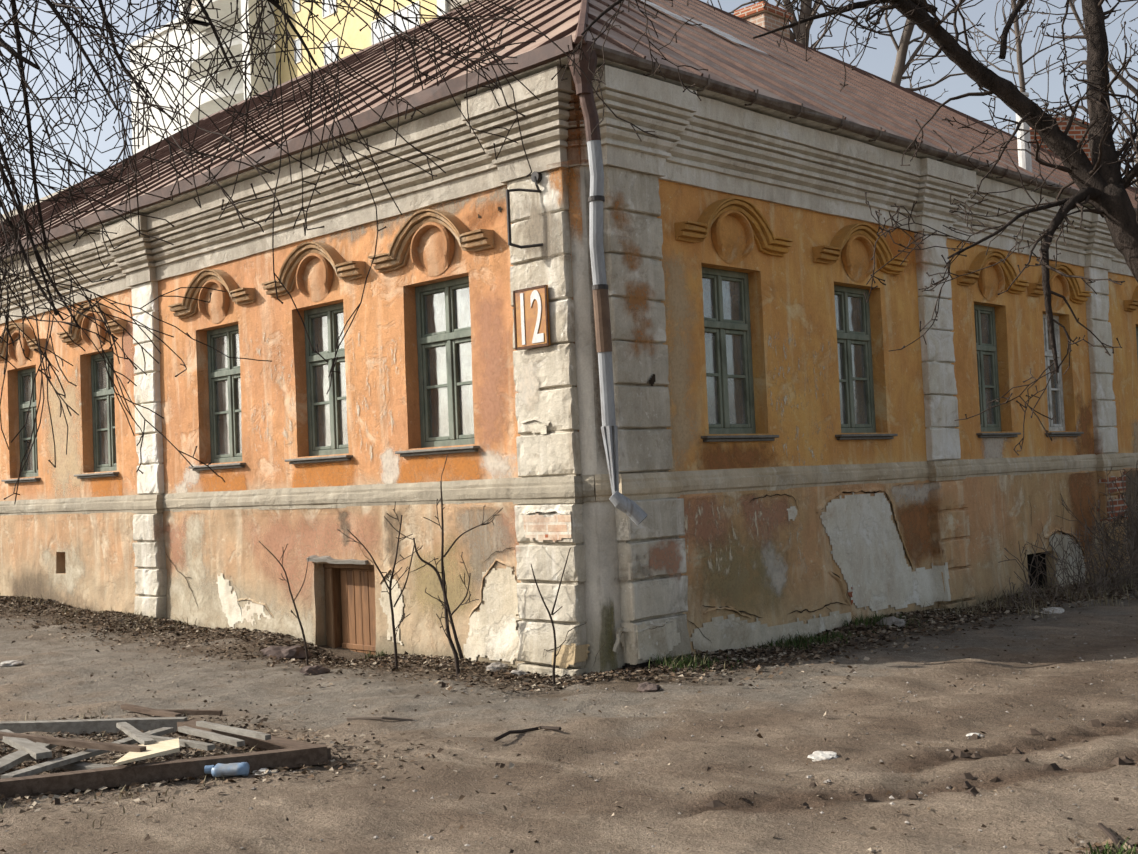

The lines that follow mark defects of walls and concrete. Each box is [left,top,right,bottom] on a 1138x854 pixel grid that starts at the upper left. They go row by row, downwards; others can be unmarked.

peeling [165,513,313,644]
flaking render [379,567,404,645]
flaking render [463,558,522,664]
flaking render [499,508,583,545]
damp [703,537,788,607]
flaking render [613,482,951,661]
flaking render [1044,528,1087,587]